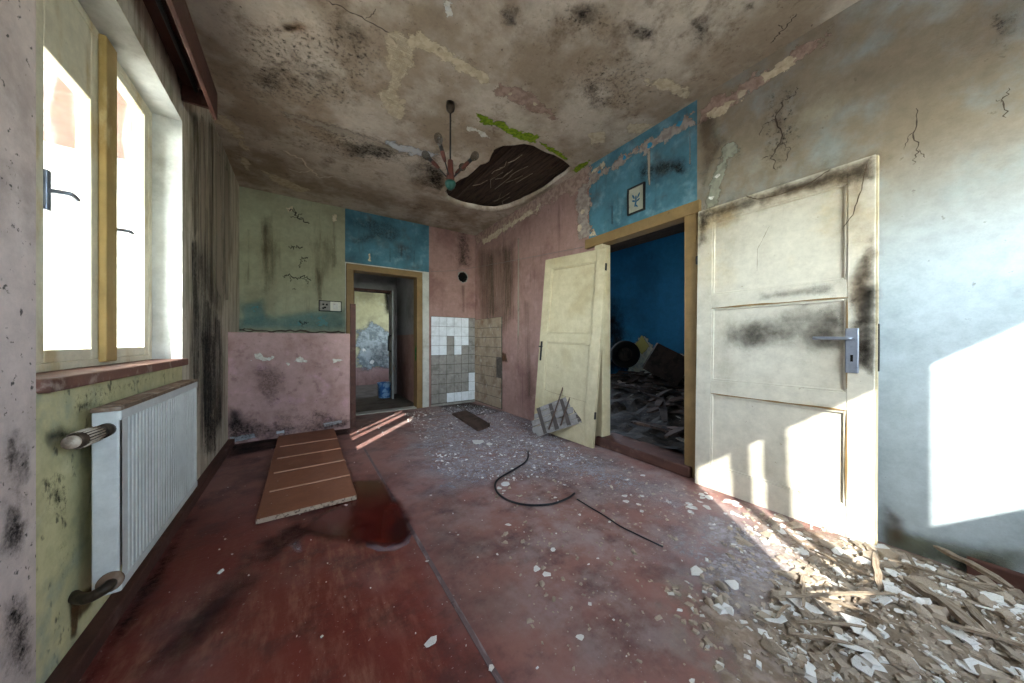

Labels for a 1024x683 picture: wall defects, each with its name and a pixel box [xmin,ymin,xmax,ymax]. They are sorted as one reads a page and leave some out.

mould [245,26,374,102]
peeling [376,30,558,121]
spalling [438,24,834,245]
crack [759,87,798,170]
crack [905,108,925,163]
leakage [192,116,293,452]
crack [284,208,311,289]
peeling [356,322,389,371]
mould [7,509,23,542]